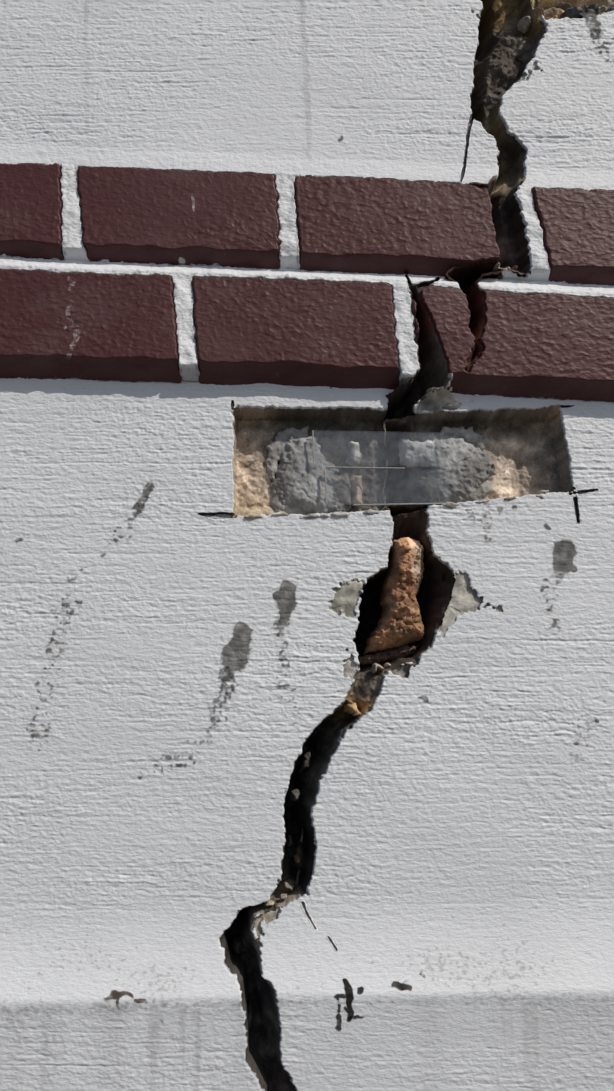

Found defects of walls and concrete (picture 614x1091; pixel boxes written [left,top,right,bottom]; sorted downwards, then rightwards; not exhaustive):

spalling [517,0,614,34]
crack [220,0,546,1091]
peeling [328,576,365,618]
peeling [438,569,503,636]
water stain [44,598,82,669]
water stain [274,617,290,666]
peeling [343,648,359,679]
peeling [391,660,420,678]
water stain [200,667,236,744]